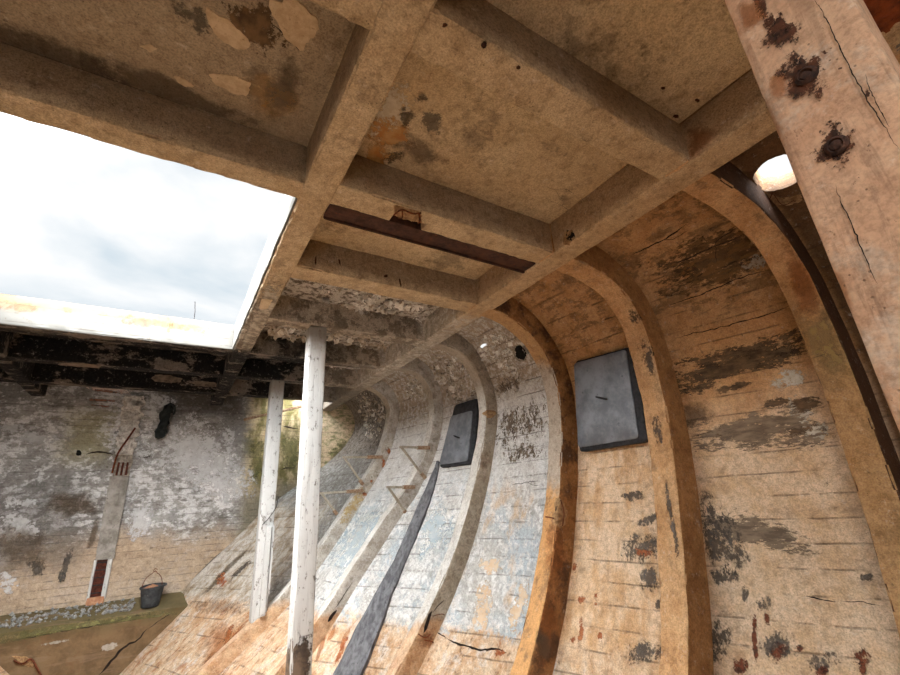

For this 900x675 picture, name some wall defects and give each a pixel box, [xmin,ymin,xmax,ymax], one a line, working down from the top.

peeling [170,0,319,55]
rust [742,0,828,100]
crack [815,1,900,150]
crack [836,187,878,284]
peeling [318,285,434,324]
peeling [150,375,216,411]
damp [0,494,103,576]
mould [621,514,660,609]
mould [700,491,771,611]
crack [418,600,506,656]
rust [733,613,770,675]
rust [853,648,872,675]